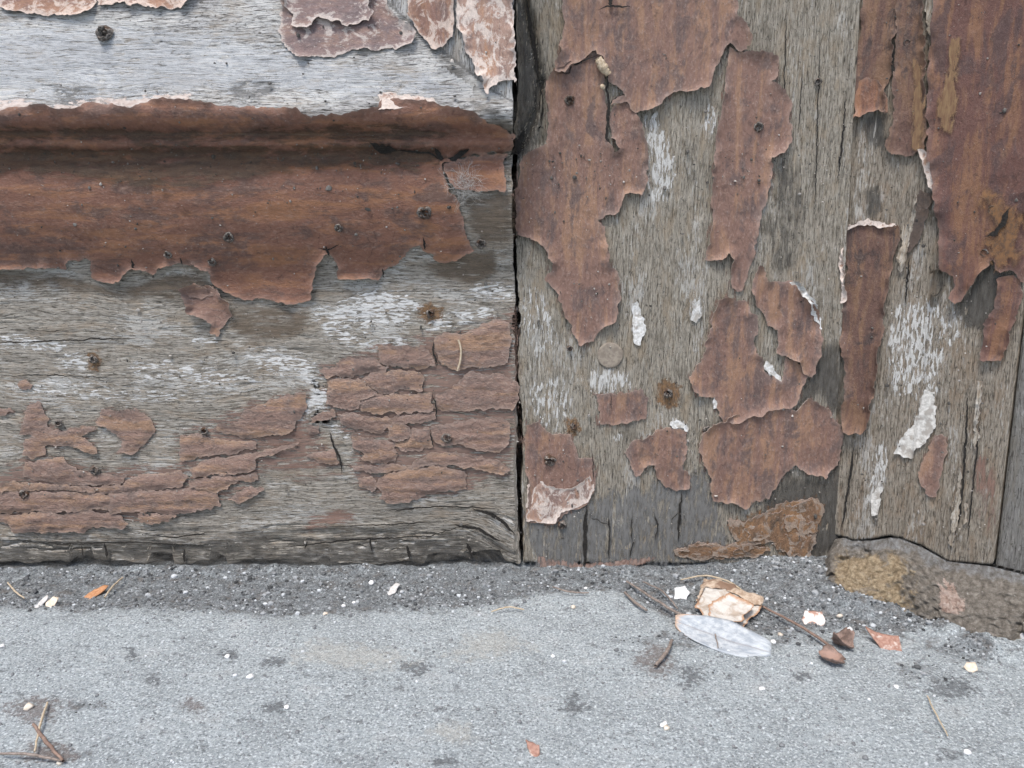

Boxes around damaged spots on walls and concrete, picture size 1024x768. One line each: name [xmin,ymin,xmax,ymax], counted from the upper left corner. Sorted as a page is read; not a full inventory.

crack [510,0,624,156]
crack [783,9,846,236]
peeling [0,0,1024,561]